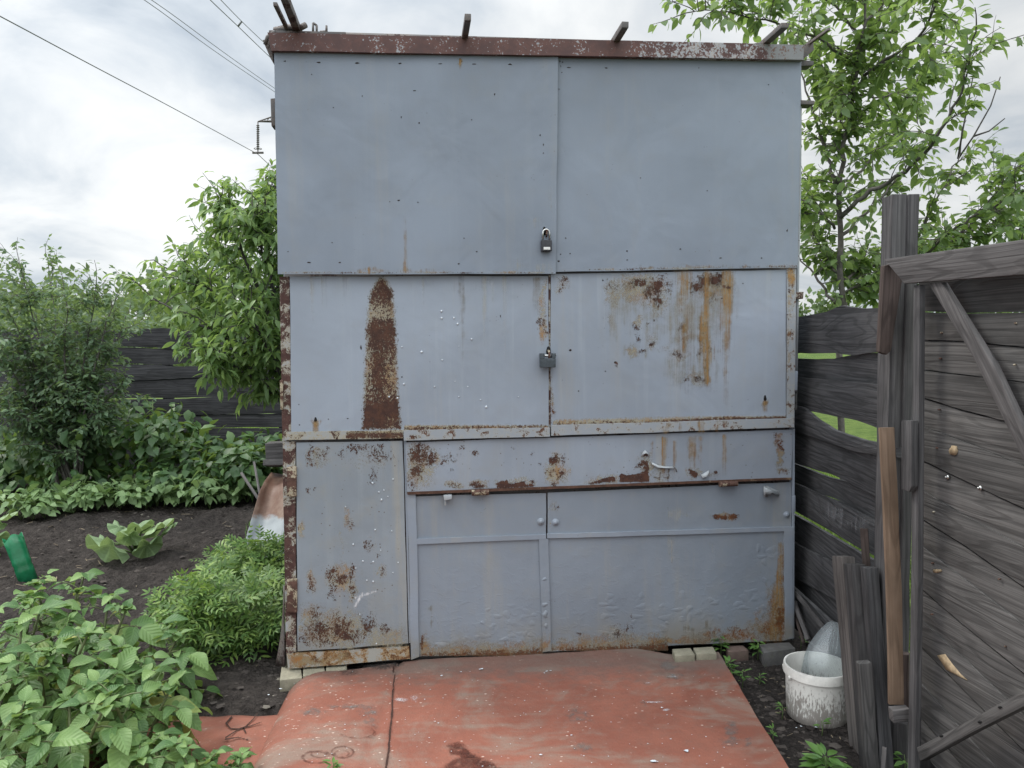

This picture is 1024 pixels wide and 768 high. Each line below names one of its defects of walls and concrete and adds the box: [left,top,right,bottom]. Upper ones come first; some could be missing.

rust [306,263,787,491]
rust [290,563,403,668]
rust [420,544,785,656]